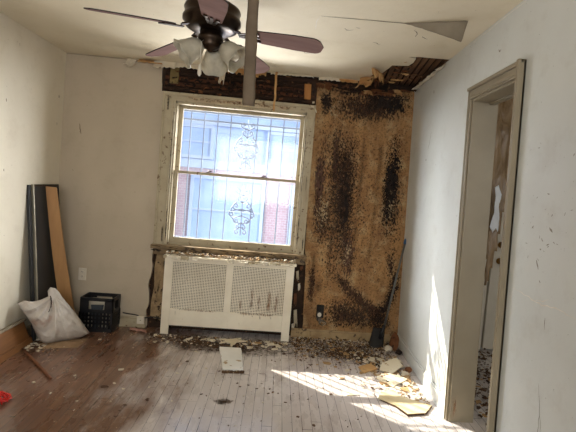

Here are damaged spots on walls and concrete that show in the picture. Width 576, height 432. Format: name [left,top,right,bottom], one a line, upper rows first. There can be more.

spalling [150,254,198,321]
flaking render [123,58,244,97]
flaking render [227,57,446,334]
damp [307,87,412,329]